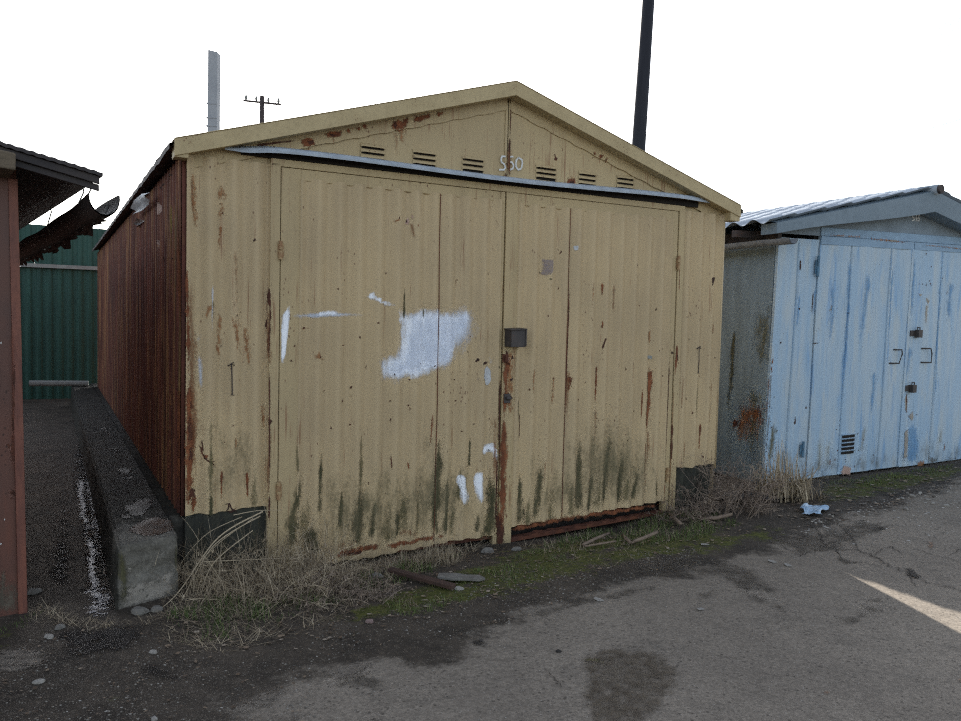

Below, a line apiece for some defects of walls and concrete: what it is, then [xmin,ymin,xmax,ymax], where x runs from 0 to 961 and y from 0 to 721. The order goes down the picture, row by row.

rust [392,112,443,139]
rust [558,287,579,405]
rust [184,271,197,513]
rust [262,377,272,518]
damp [301,462,323,553]
rust [337,531,443,557]
damp [335,442,471,539]
damp [476,482,496,533]
damp [525,472,553,524]
rust [489,347,698,544]
damp [566,442,639,515]
damp [585,650,675,721]